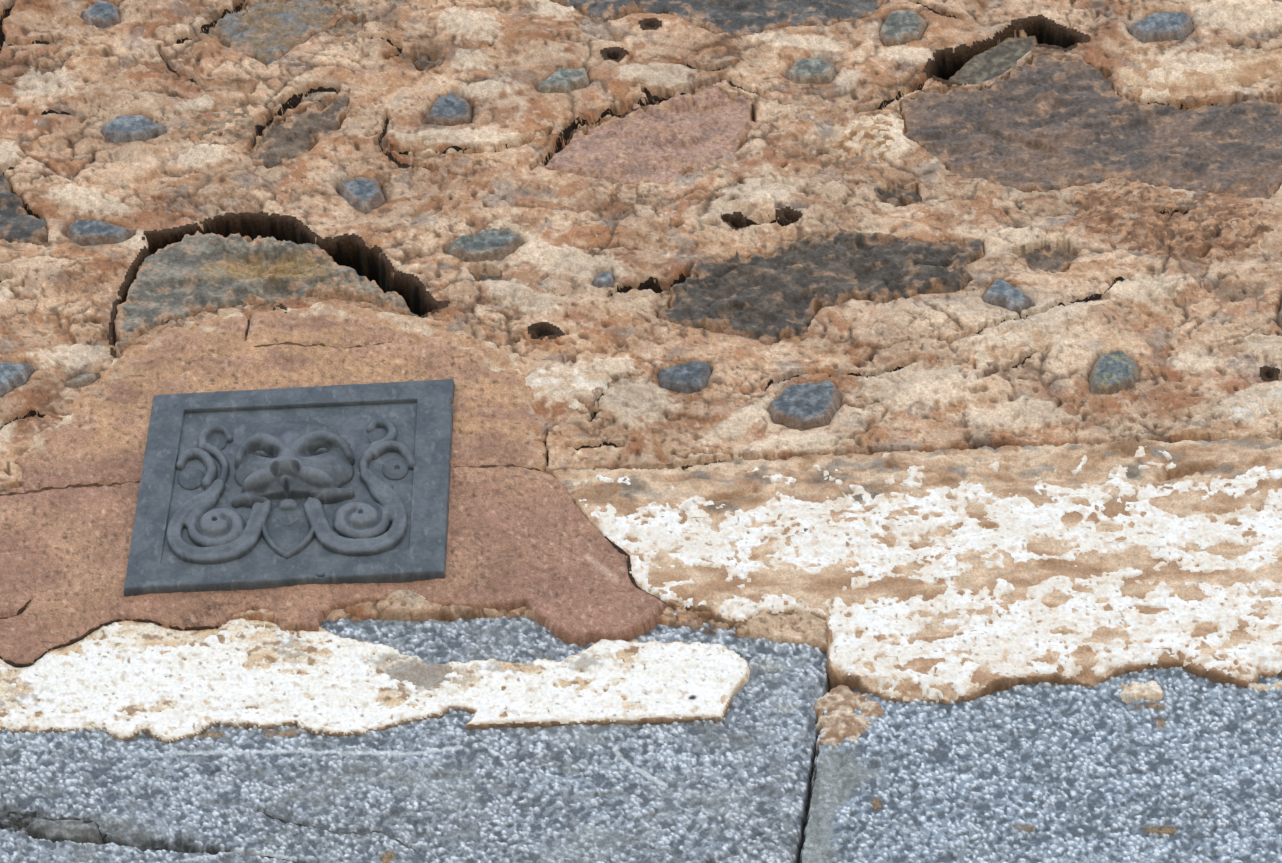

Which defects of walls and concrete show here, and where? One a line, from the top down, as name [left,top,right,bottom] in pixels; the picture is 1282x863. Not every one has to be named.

crack [0,6,50,53]
crack [378,64,757,170]
crack [3,167,40,219]
crack [245,319,392,349]
peeling [574,446,1282,703]
peeling [0,618,748,742]
crack [798,685,830,863]
peeling [0,811,107,845]
crack [257,810,416,852]